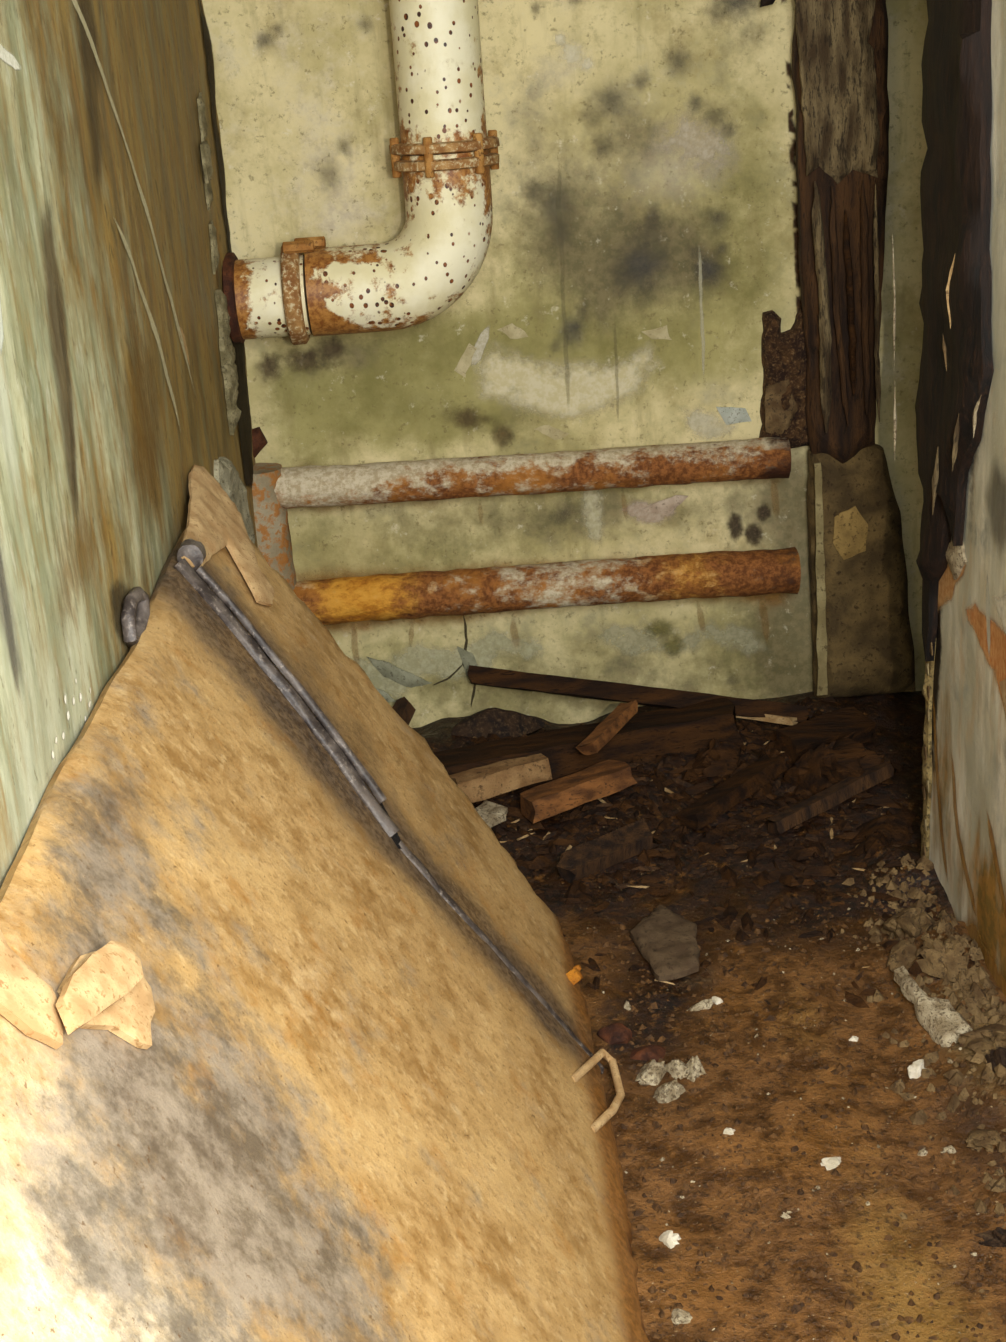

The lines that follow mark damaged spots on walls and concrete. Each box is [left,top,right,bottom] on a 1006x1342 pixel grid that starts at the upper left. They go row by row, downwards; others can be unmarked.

peeling [938,541,967,608]
peeling [967,597,1006,714]